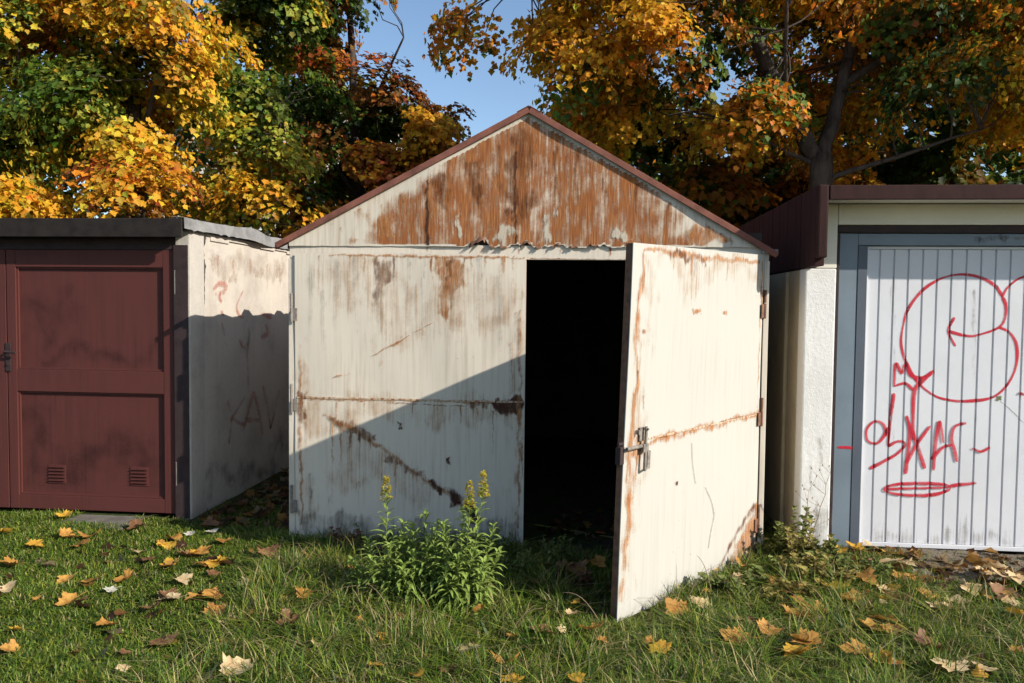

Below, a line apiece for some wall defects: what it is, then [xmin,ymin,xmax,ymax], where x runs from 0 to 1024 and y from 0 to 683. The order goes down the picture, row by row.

corrosion [338,117,763,339]
corrosion [297,318,524,524]
corrosion [627,352,759,472]
corrosion [623,489,631,563]
corrosion [722,503,757,562]